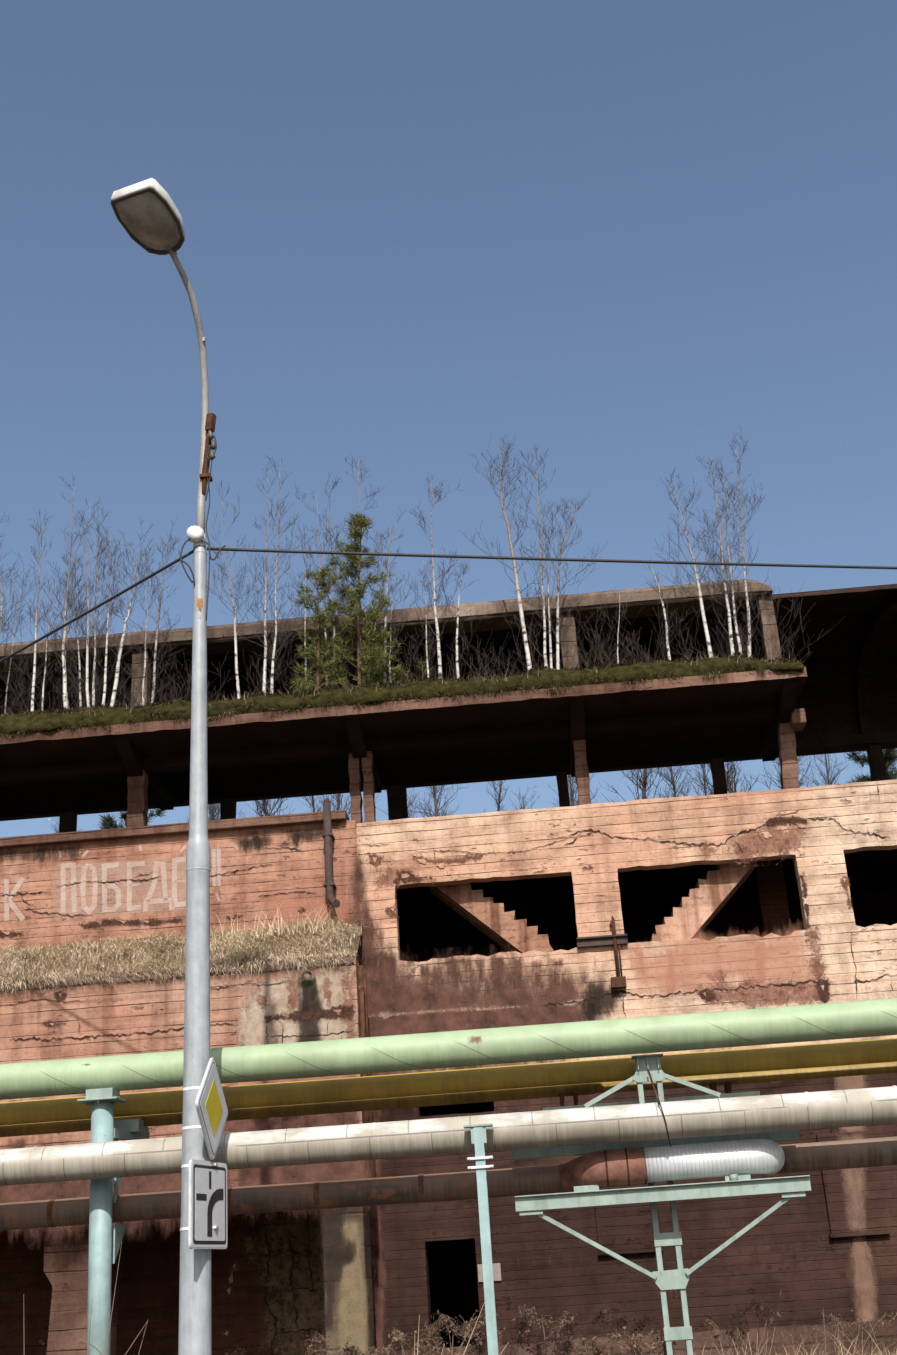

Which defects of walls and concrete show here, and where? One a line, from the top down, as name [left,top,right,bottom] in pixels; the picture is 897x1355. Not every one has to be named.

crack [363,822,768,858]
crack [811,785,889,840]
peeling [236,969,358,1046]
leakage [356,942,604,1037]
leakage [370,1059,565,1076]